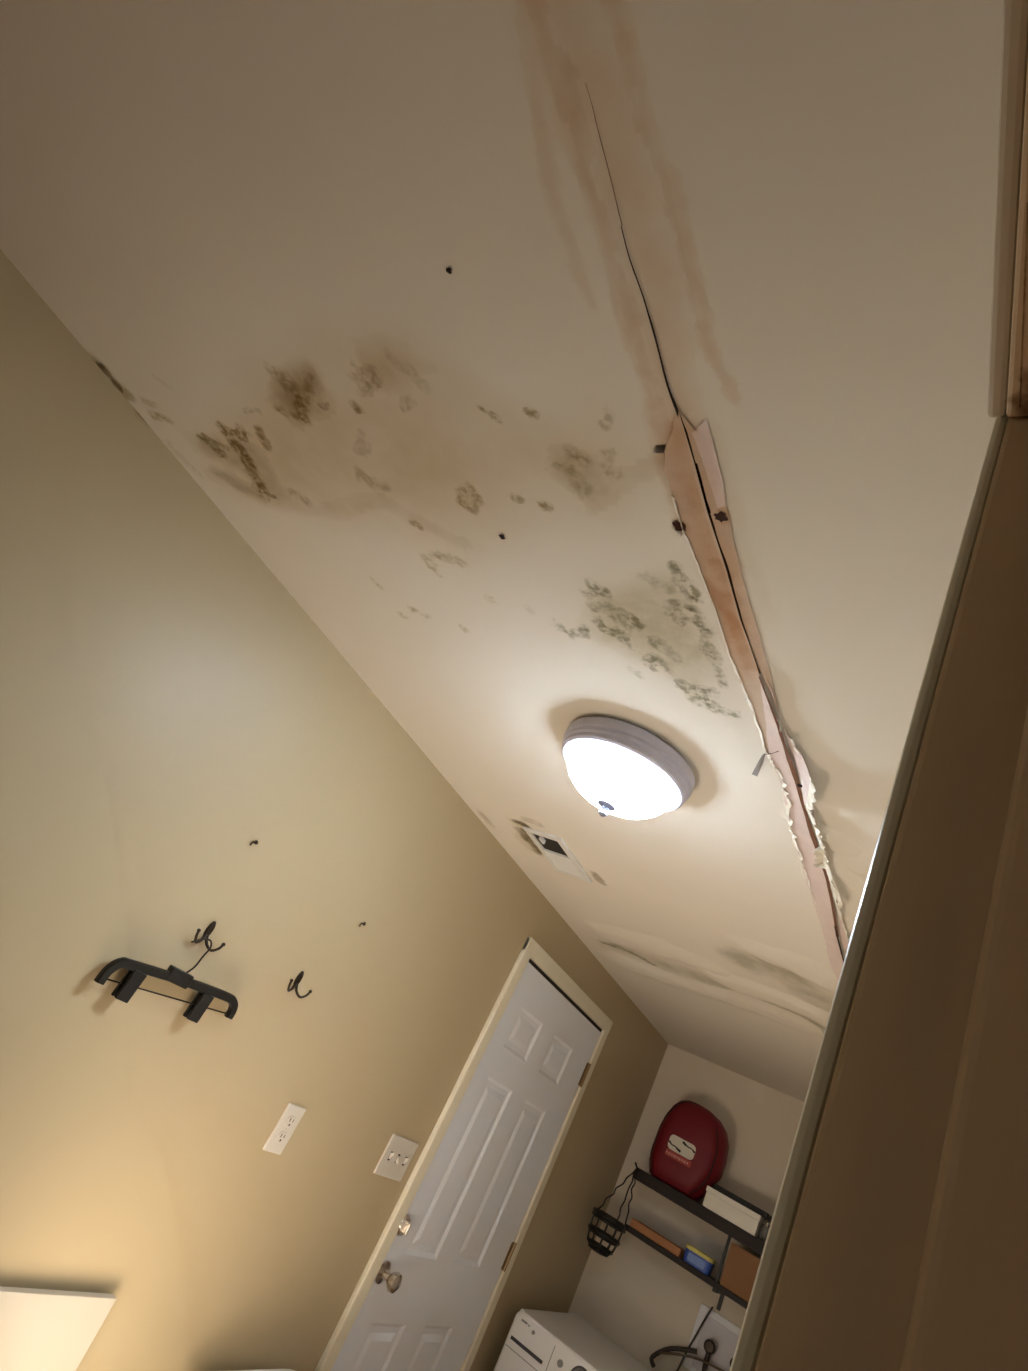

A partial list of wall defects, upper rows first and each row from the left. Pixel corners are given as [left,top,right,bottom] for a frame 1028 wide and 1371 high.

crack [585,83,844,962]
peeling [671,496,850,963]